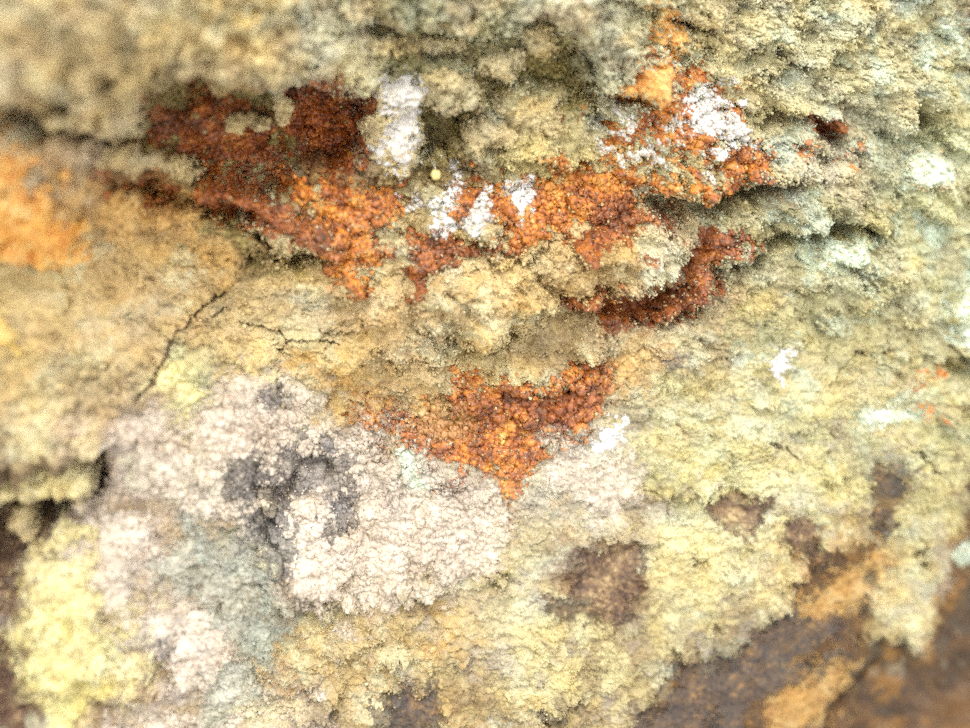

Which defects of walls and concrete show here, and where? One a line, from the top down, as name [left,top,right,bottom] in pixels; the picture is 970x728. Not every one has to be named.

damp [358,5,396,37]
damp [365,65,537,241]
damp [438,24,762,186]
rust [0,0,780,521]
damp [0,354,532,728]
damp [951,539,970,569]